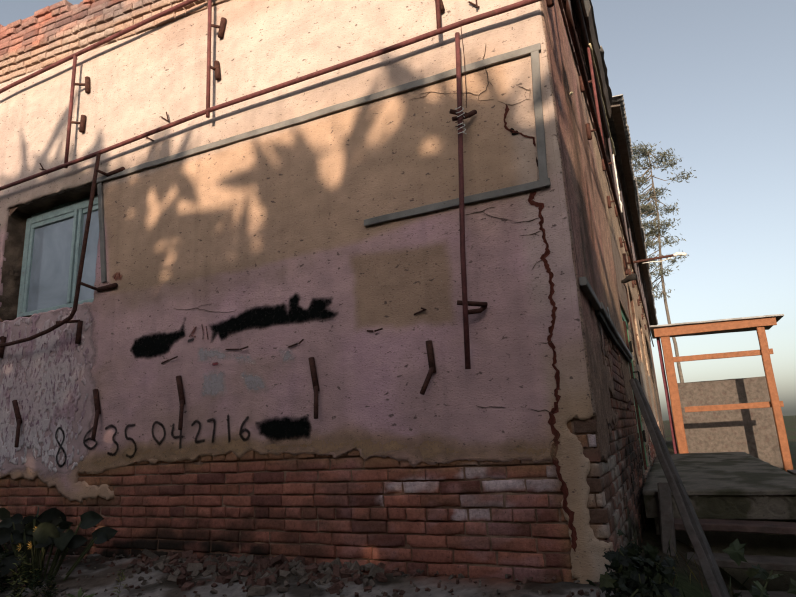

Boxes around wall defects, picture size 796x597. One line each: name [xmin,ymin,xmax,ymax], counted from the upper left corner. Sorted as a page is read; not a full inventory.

crack [411,46,538,167]
spalling [0,305,577,583]
crack [466,192,578,552]
spalling [567,326,656,552]